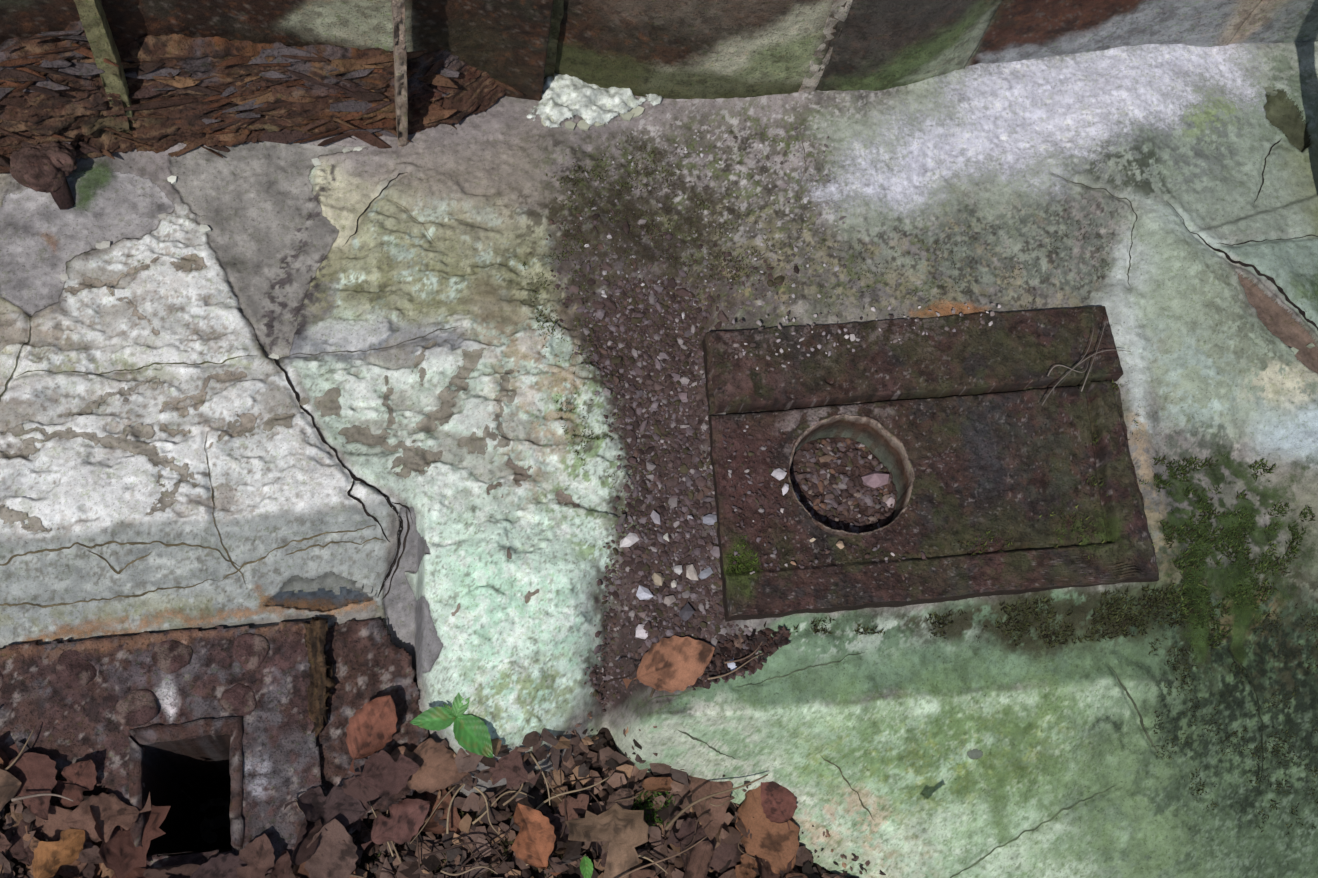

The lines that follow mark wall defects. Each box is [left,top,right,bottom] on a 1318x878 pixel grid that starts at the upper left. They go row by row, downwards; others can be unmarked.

crack [1254,140,1281,202]
crack [1053,173,1138,286]
crack [1170,204,1318,330]
spalling [1236,272,1318,373]
crack [0,288,463,682]